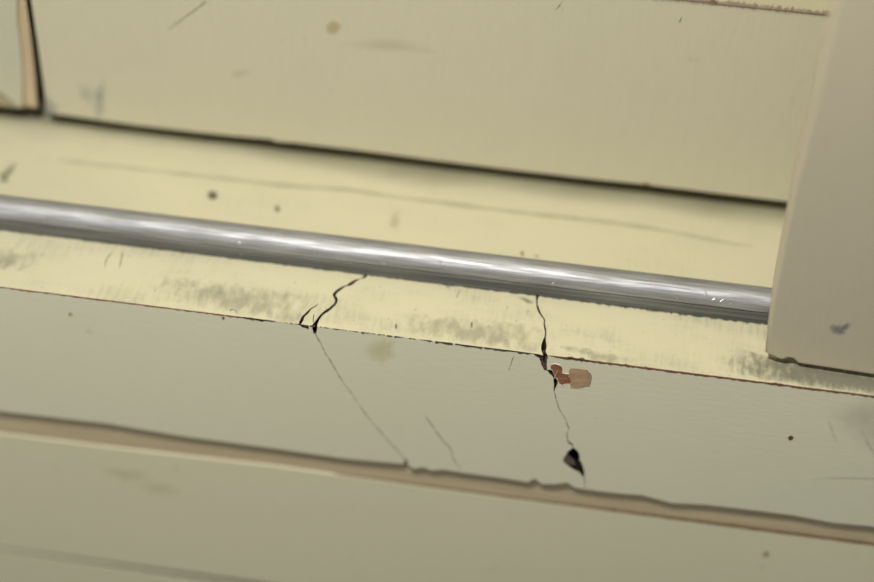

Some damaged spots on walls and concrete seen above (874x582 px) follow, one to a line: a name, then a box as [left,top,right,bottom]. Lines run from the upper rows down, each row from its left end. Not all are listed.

crack [299,275,367,333]
crack [534,296,573,448]
peeling [550,356,592,388]